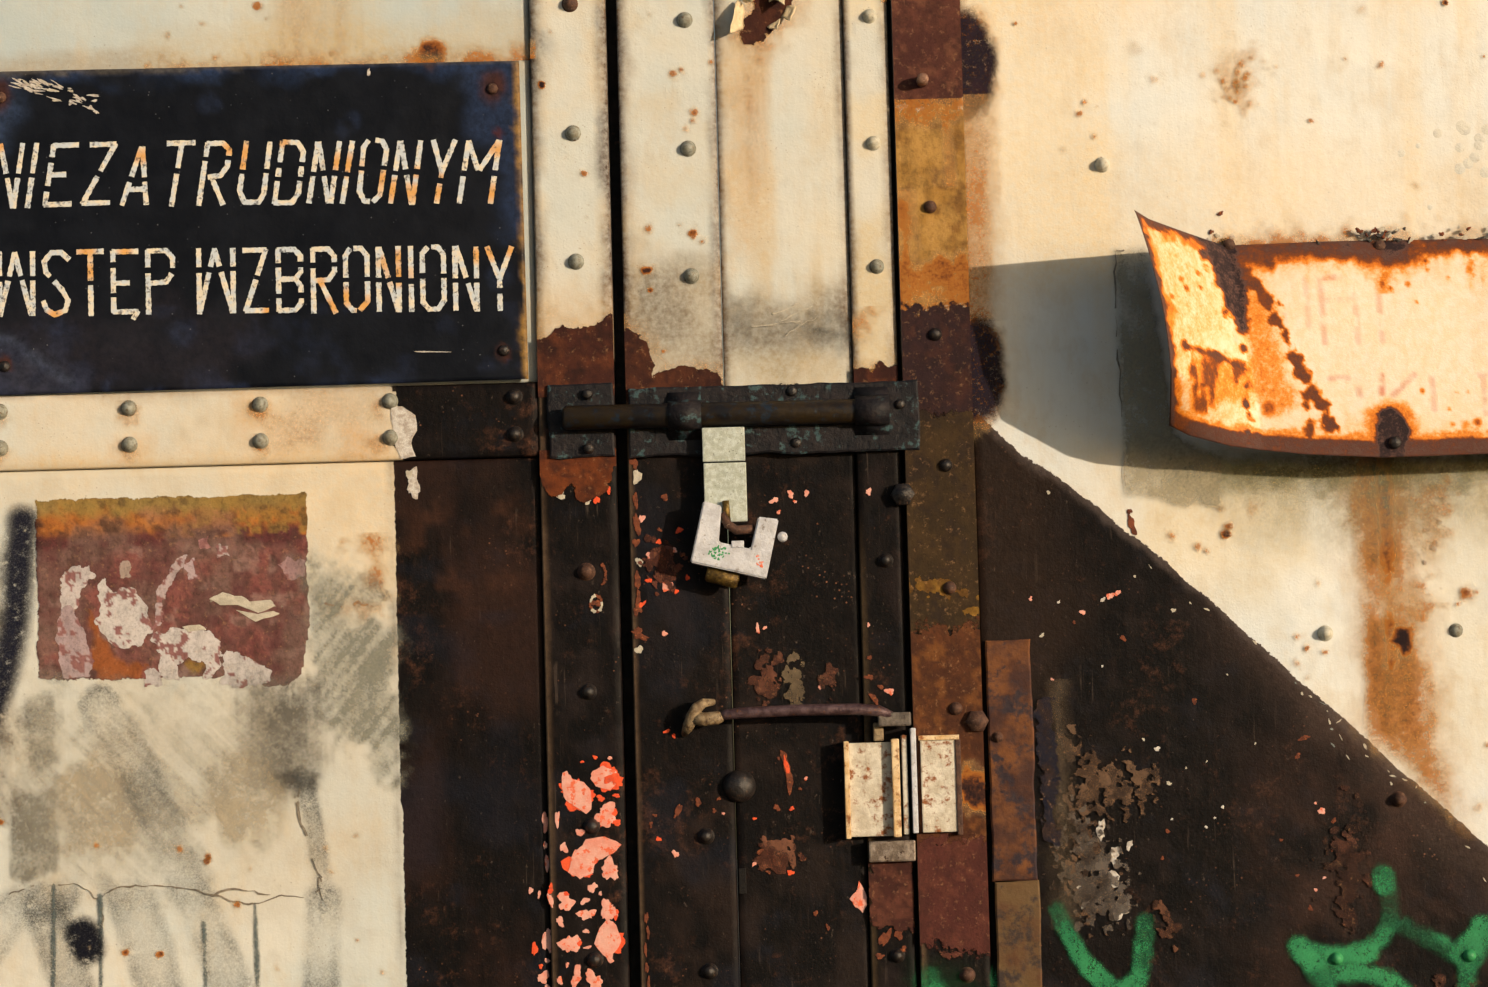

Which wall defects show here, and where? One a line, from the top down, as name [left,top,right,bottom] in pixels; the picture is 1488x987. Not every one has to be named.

peeling [730,0,796,45]
rust [1212,225,1484,245]
rust [537,313,723,404]
peeling [35,492,310,688]
rust [854,0,1005,960]
rust [1350,456,1452,794]
peeling [529,755,625,987]
peeling [1040,724,1172,947]